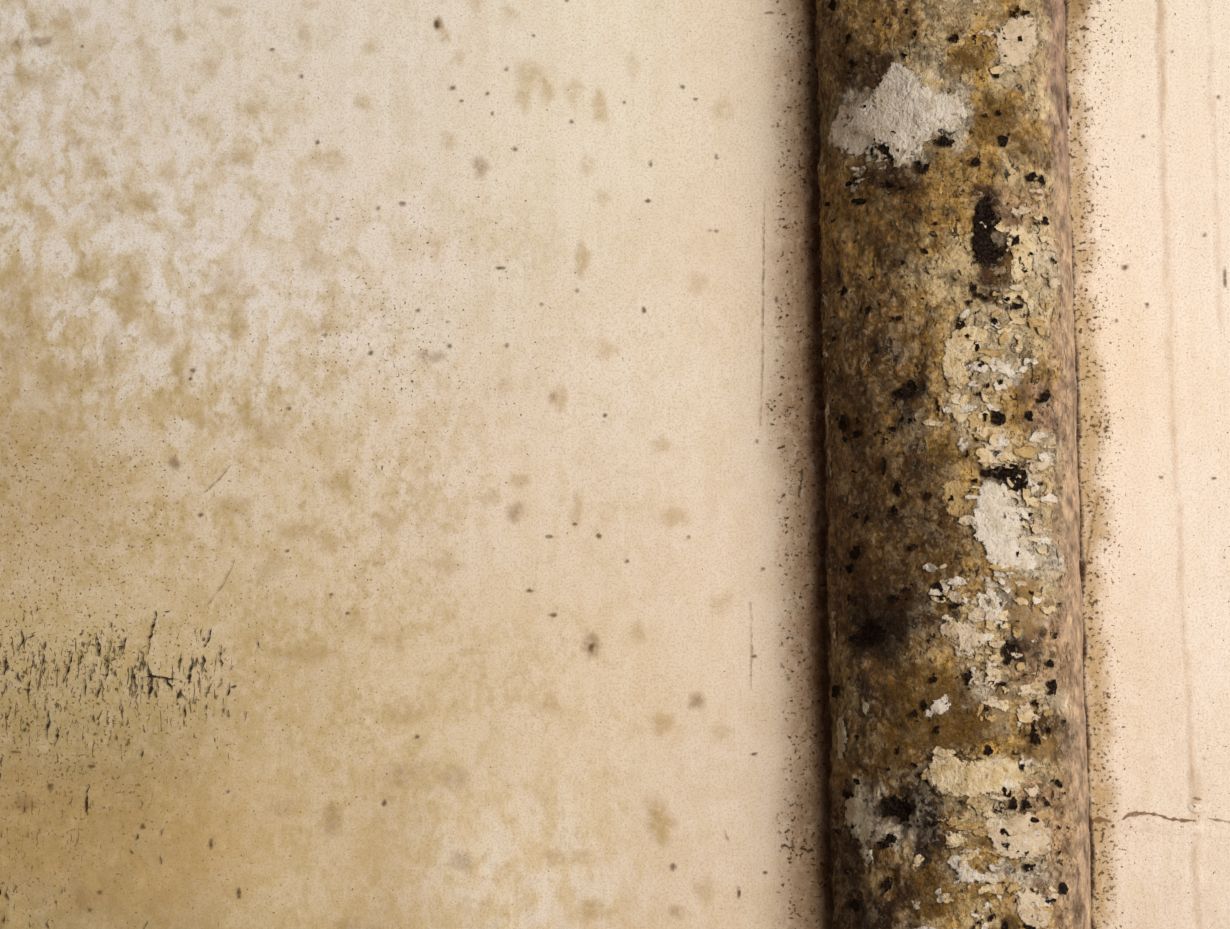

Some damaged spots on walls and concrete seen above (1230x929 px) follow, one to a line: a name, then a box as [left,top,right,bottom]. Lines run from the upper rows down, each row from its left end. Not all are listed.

peeling [828,52,1001,205]
damp [763,0,830,929]
damp [1066,0,1118,928]
peeling [829,172,1069,929]
rust [884,665,984,767]
crack [1091,797,1227,825]
rust [909,864,953,917]